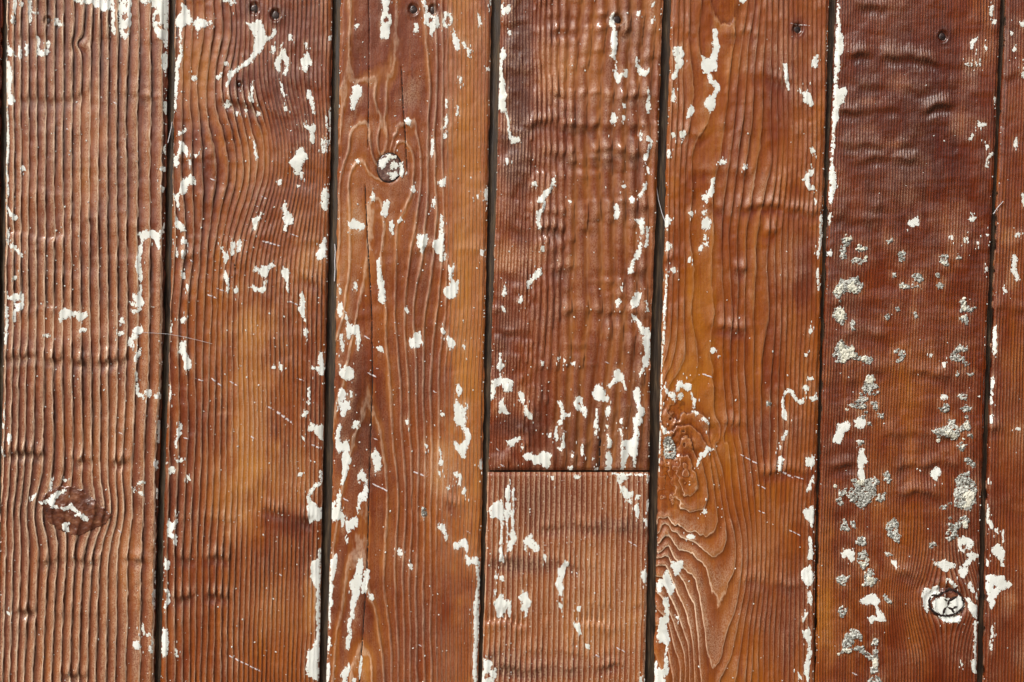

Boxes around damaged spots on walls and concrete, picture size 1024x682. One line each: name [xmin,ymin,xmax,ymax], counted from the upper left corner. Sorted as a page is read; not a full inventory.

peeling [74,0,213,114]
peeling [216,19,312,97]
peeling [118,128,196,401]
spalling [816,1,892,510]
peeling [301,281,382,533]
peeling [523,274,709,527]
peeling [305,548,374,682]
peeling [437,523,497,682]
peeling [489,484,547,618]
peeling [641,560,683,682]
peeling [801,505,814,682]
peeling [921,394,1012,674]